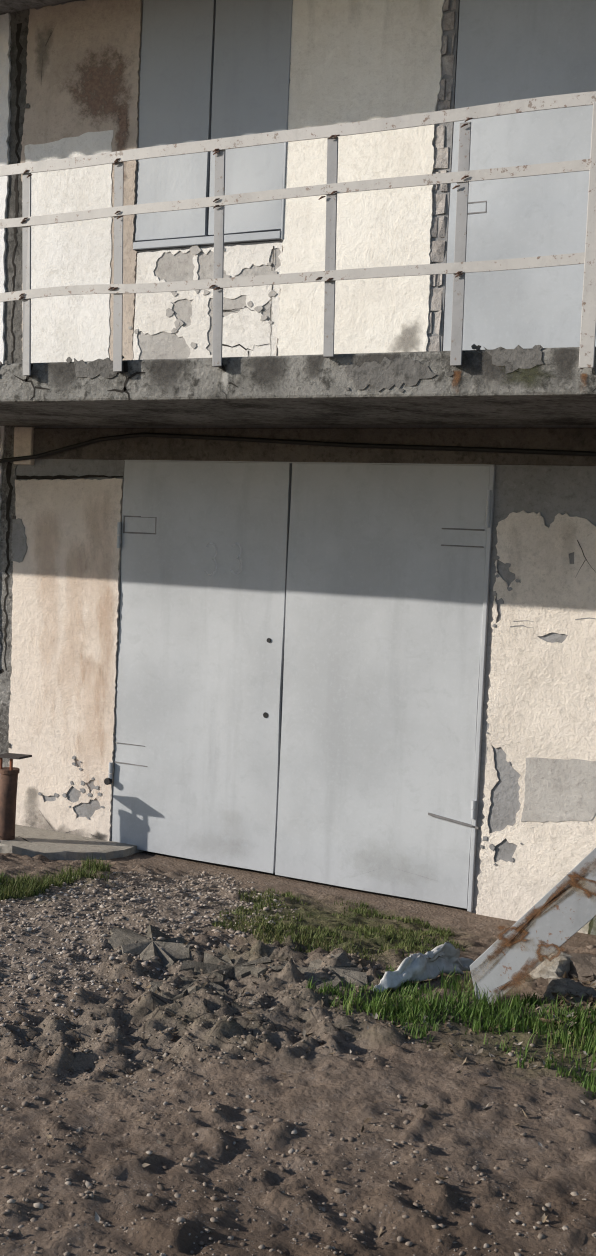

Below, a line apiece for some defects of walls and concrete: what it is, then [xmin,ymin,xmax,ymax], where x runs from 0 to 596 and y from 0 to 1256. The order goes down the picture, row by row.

damp [69,50,128,151]
peeling [128,245,283,360]
crack [0,462,123,674]
peeling [492,555,521,627]
spalling [538,632,568,643]
damp [28,789,36,808]
peeling [38,756,104,820]
damp [44,821,106,840]
peeling [480,732,522,865]
rust [488,867,596,993]